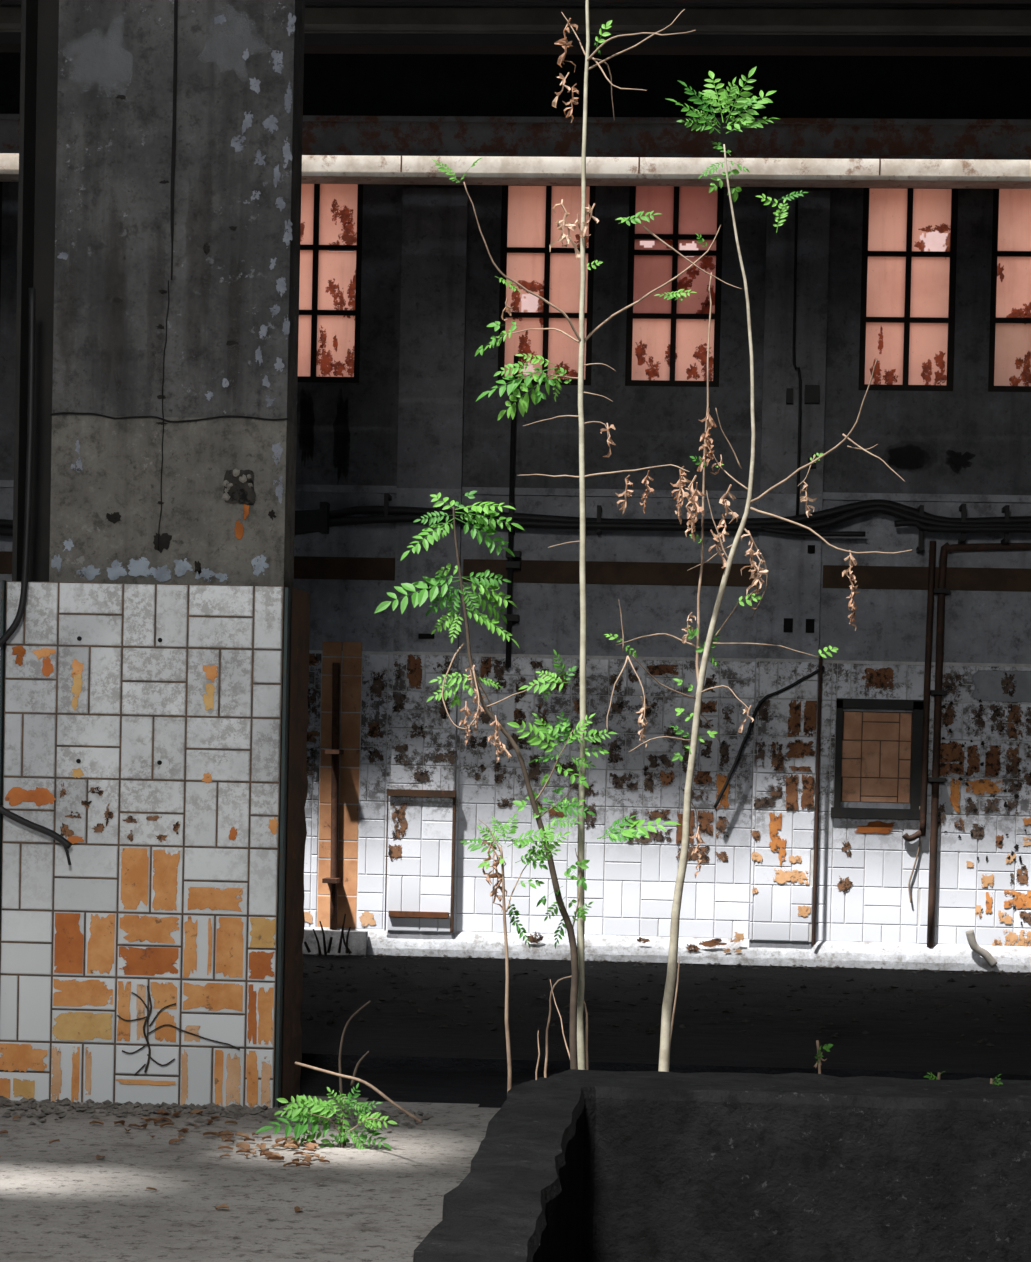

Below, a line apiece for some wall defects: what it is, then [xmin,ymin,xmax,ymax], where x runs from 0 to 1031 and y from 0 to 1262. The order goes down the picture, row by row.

peeling [0,782,276,1107]
peeling [750,700,817,893]
peeling [938,670,1031,947]